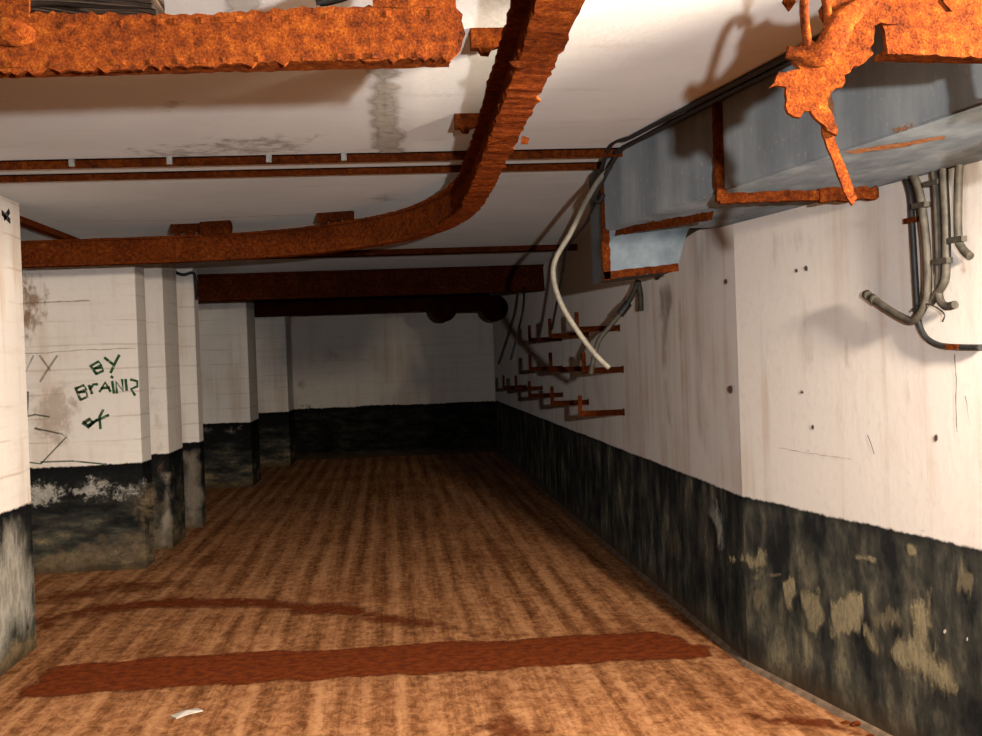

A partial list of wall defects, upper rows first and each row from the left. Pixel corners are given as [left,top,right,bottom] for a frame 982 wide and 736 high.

water stain [370,69,404,153]
rust [845,125,946,154]
water stain [711,501,722,547]